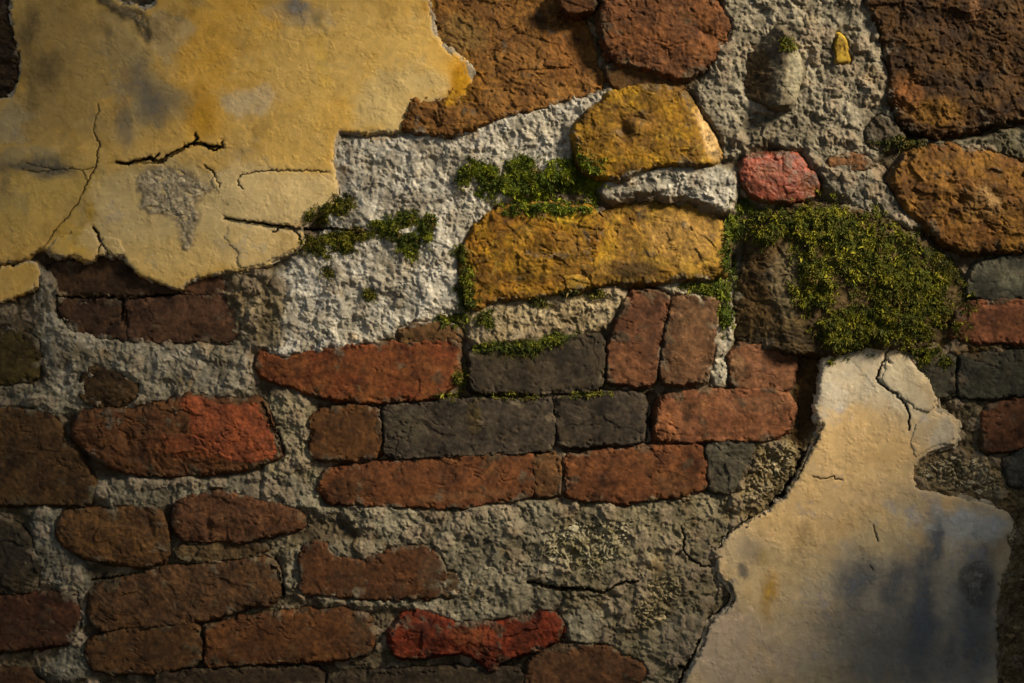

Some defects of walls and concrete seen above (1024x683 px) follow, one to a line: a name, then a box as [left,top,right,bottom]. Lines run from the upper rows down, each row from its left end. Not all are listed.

spalling [98,0,150,42]
peeling [0,260,44,303]
peeling [49,229,125,263]
crack [26,106,322,242]
spalling [137,166,231,251]
peeling [224,173,340,268]
crack [226,218,370,239]
crack [876,347,911,430]
peeling [882,350,1008,501]
spalling [740,437,802,507]
damp [831,529,942,671]
spalling [995,517,1024,683]